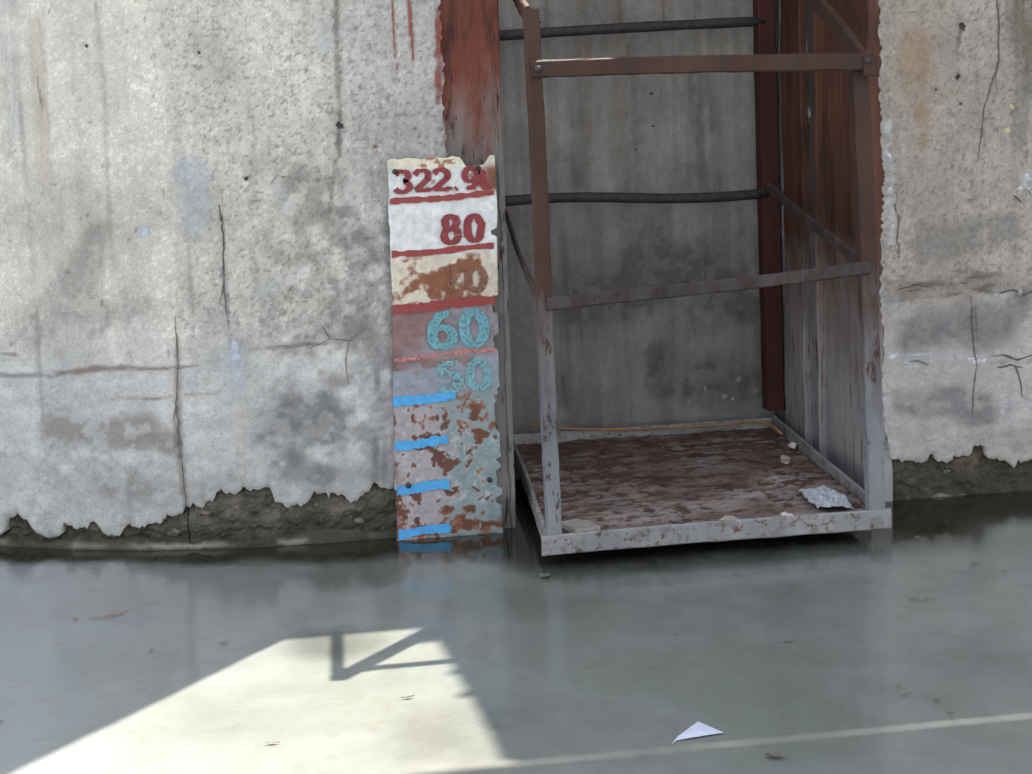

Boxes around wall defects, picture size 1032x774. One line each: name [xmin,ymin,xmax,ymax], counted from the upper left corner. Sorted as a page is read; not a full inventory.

crack [977,0,1000,162]
crack [172,321,186,502]
crack [970,296,978,415]
spalling [9,482,397,547]
spalling [892,445,1032,500]